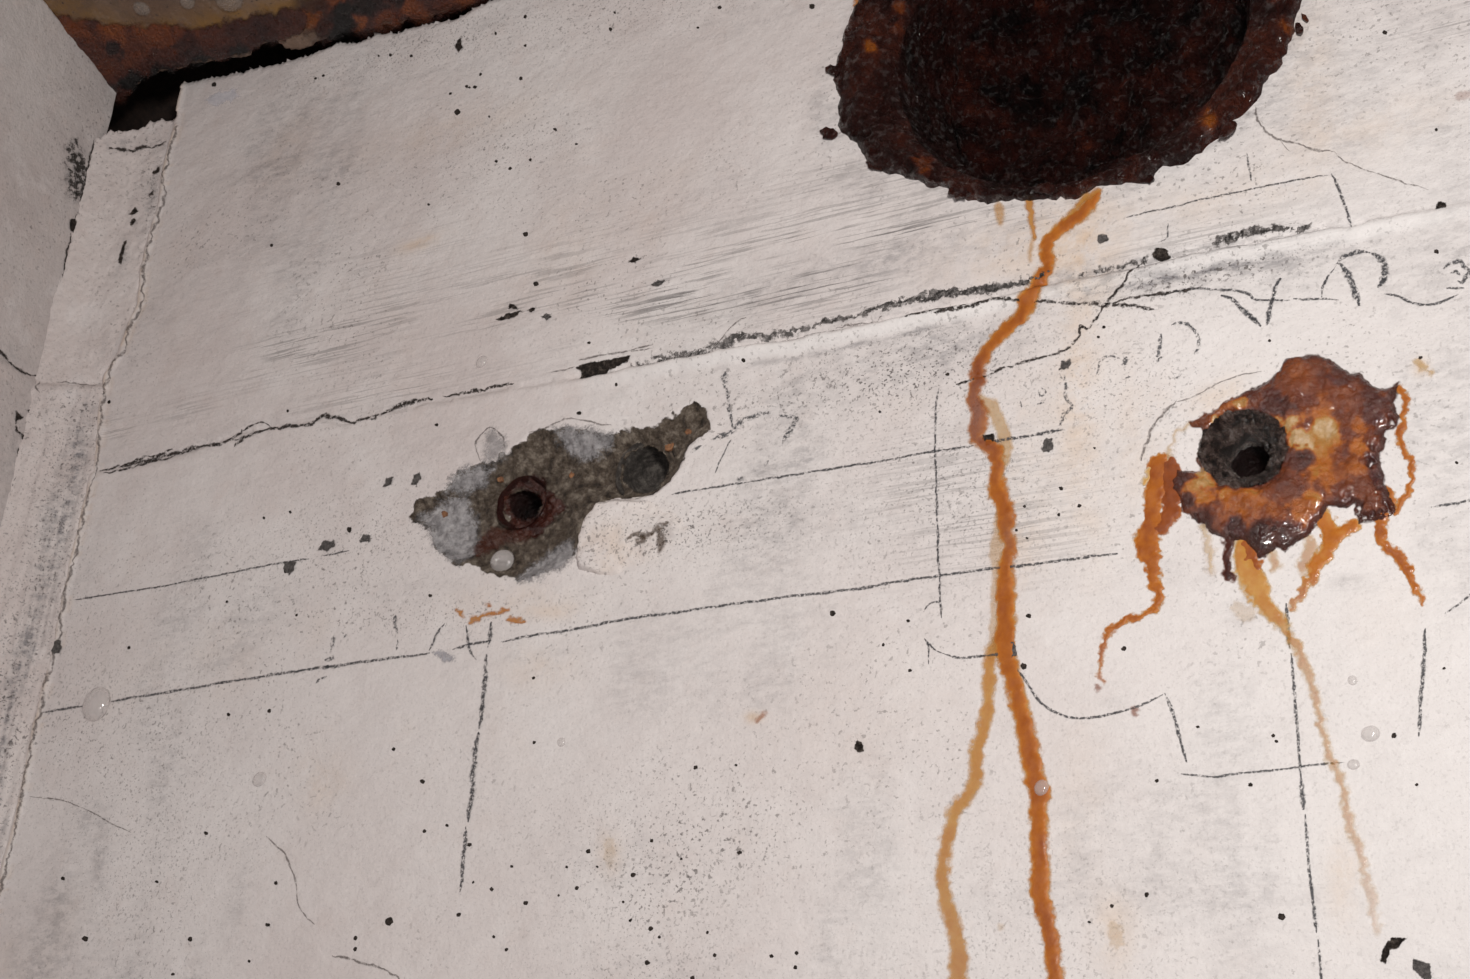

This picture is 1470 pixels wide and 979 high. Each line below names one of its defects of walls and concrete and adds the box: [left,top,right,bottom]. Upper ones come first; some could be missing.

corrosion [53,0,485,103]
corrosion [1295,13,1309,36]
corrosion [1219,120,1237,138]
corrosion [948,187,971,199]
crack [554,344,653,372]
crack [717,260,1194,385]
crack [475,418,611,459]
crack [0,126,514,892]
spalling [409,401,711,582]
corrosion [1098,355,1426,682]
corrosion [936,189,1101,979]
crack [333,956,399,979]